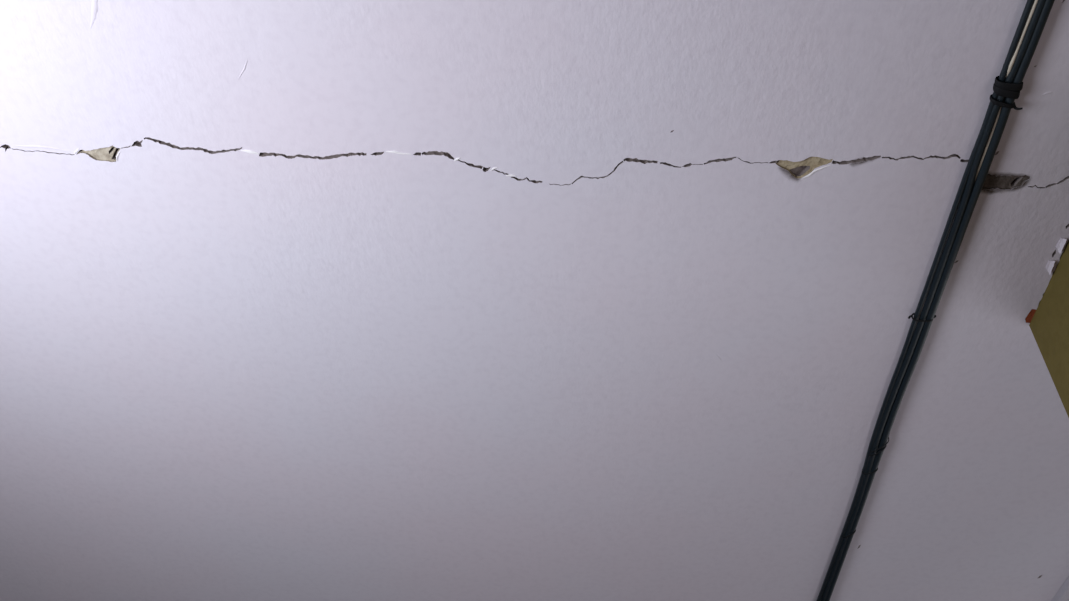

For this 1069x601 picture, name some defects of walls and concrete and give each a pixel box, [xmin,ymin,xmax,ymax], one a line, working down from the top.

crack [0,144,75,155]
spalling [74,145,121,162]
crack [121,137,777,186]
spalling [776,157,833,180]
crack [832,154,969,165]
spalling [982,174,1030,190]
crack [1028,176,1069,188]